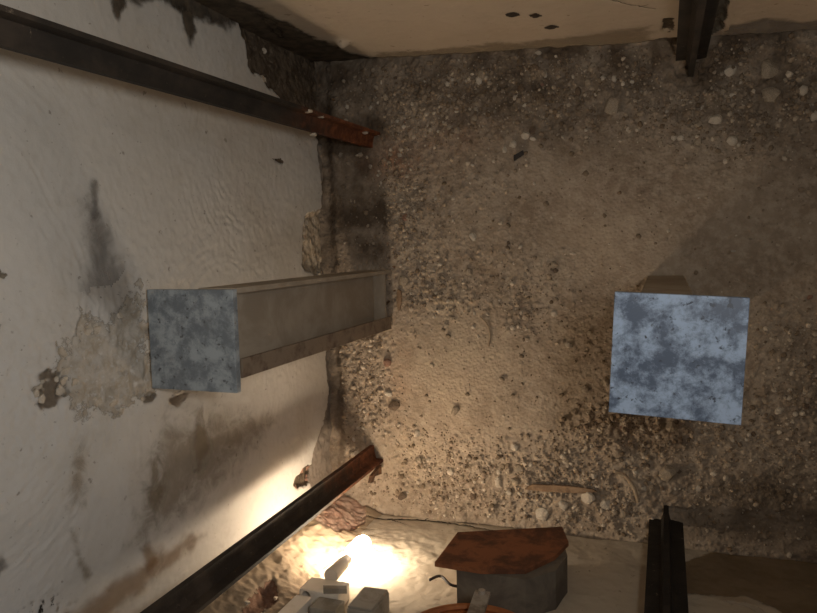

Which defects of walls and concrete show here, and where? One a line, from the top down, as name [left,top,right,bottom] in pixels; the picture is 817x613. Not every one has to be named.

flaking render [240,27,318,111]
water stain [91,213,119,297]
flaking render [32,279,157,422]